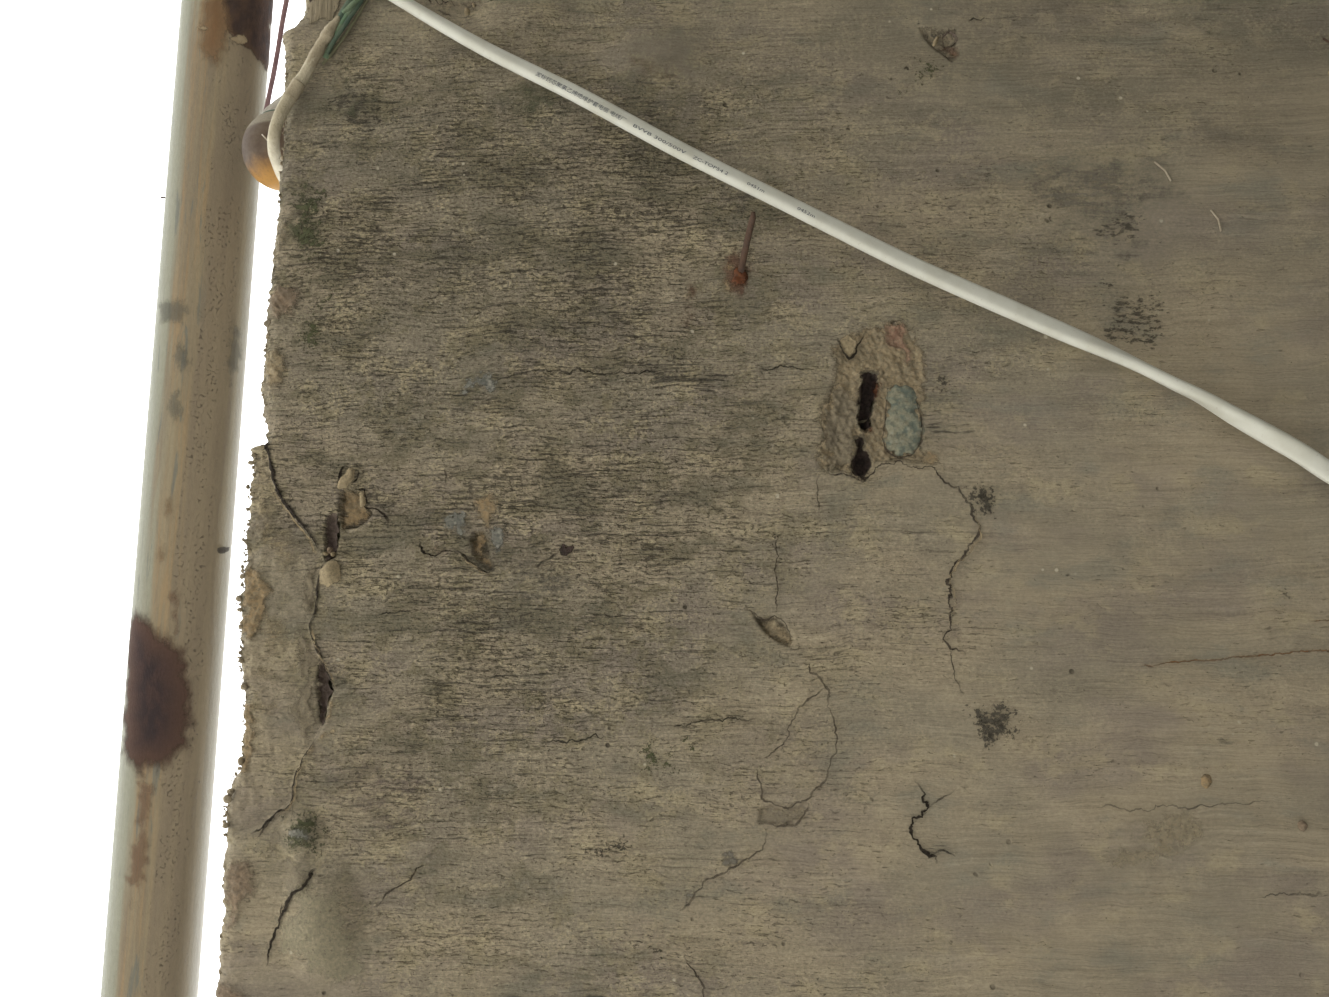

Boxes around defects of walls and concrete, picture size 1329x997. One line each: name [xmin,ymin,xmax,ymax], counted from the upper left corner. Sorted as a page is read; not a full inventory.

spalling [815,320,937,481]
spalling [319,466,389,587]
crack [771,534,779,606]
crack [817,460,982,682]
crack [250,442,335,853]
crack [1145,620,1329,667]
corrosion [123,613,191,883]
crack [677,664,838,907]
crack [909,787,952,858]
crack [267,870,313,962]
crack [687,963,705,997]